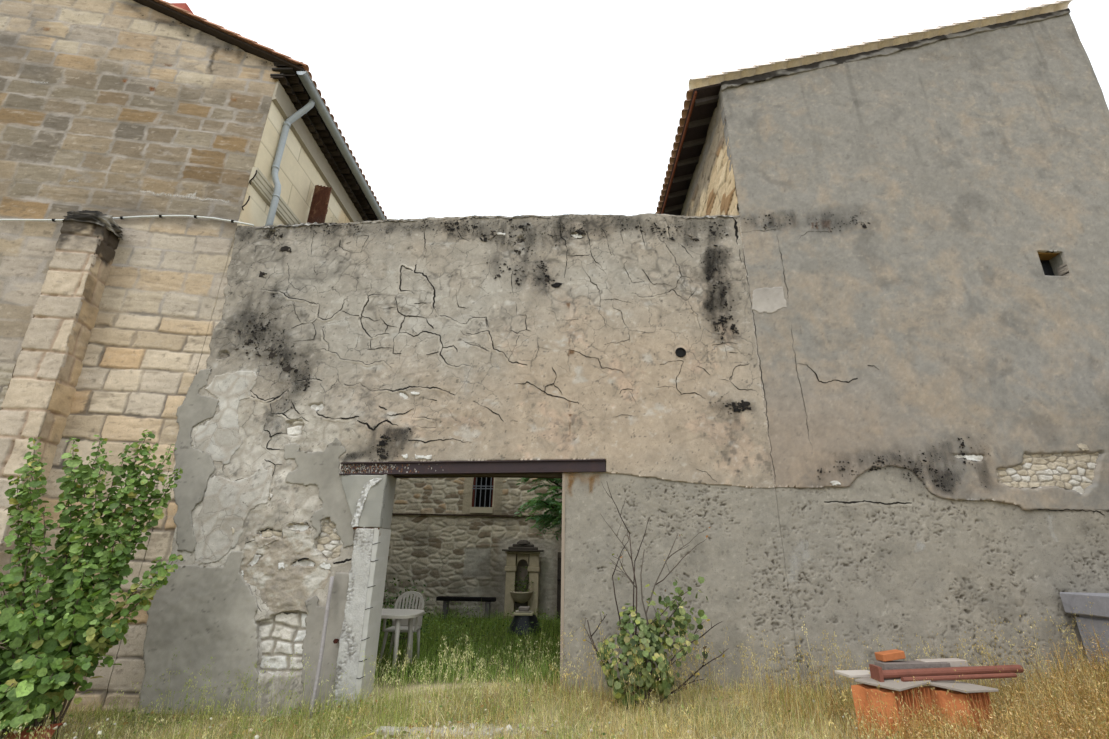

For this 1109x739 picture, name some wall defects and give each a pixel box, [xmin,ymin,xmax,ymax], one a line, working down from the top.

water stain [420,214,739,343]
water stain [235,293,310,436]
crack [226,217,828,477]
crack [791,324,878,450]
flaking render [191,370,343,674]
crack [824,500,912,508]
water stain [817,437,989,494]
flaking render [996,444,1100,494]
crack [1034,508,1105,516]